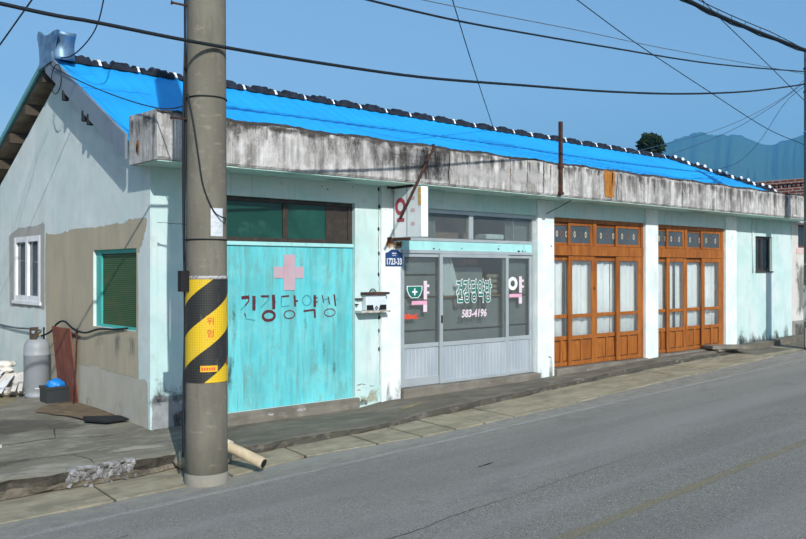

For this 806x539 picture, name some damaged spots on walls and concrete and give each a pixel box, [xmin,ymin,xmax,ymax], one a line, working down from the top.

water stain [226,120,330,155]
water stain [342,136,449,180]
water stain [455,151,543,185]
rust [604,170,615,197]
water stain [737,325,804,344]
spalling [65,457,137,489]